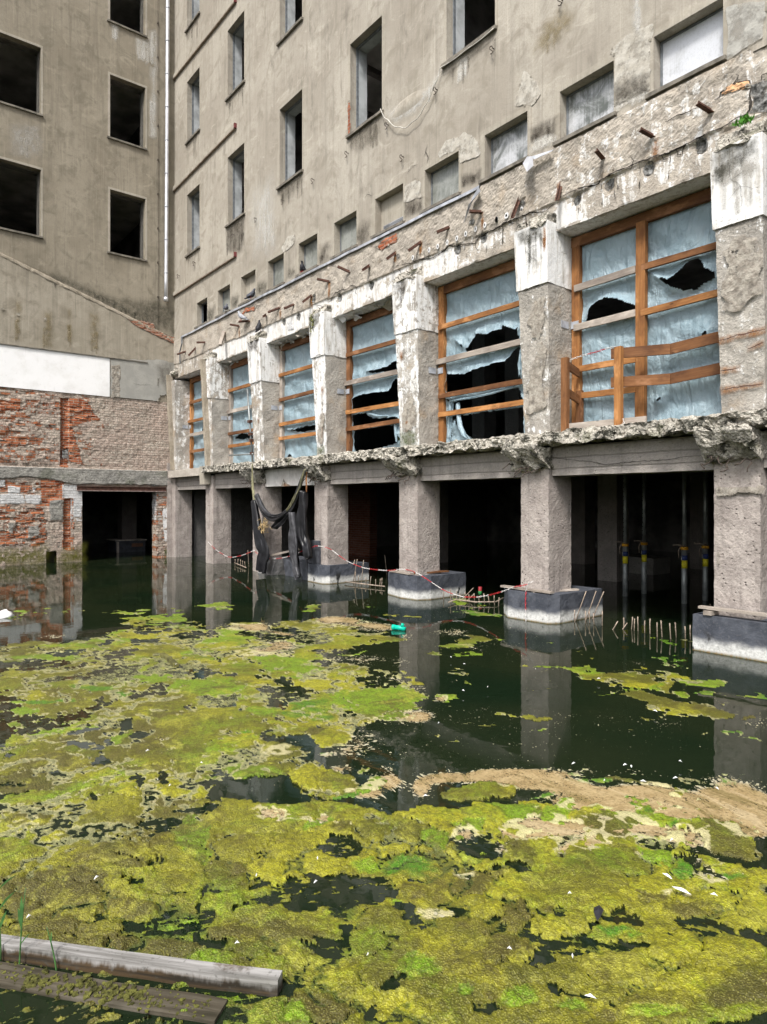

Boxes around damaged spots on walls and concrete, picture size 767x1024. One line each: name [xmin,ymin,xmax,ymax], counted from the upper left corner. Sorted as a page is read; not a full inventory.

spalling [721,73,767,113]
peeling [438,132,480,163]
spalling [201,407,767,490]